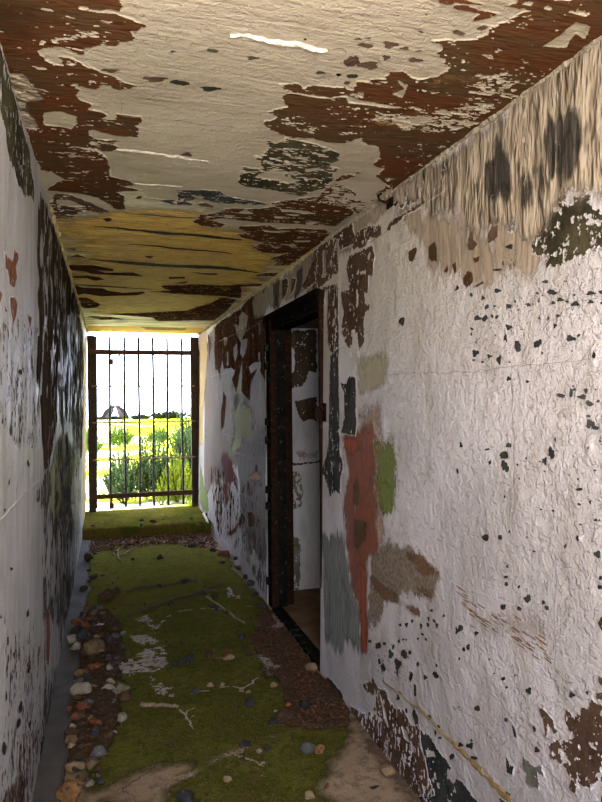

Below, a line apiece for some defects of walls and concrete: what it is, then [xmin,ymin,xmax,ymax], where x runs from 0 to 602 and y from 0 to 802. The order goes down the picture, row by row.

peeling [0,0,267,646]
peeling [142,0,602,497]
water stain [353,40,602,286]
peeling [368,638,411,676]
peeling [505,674,602,802]